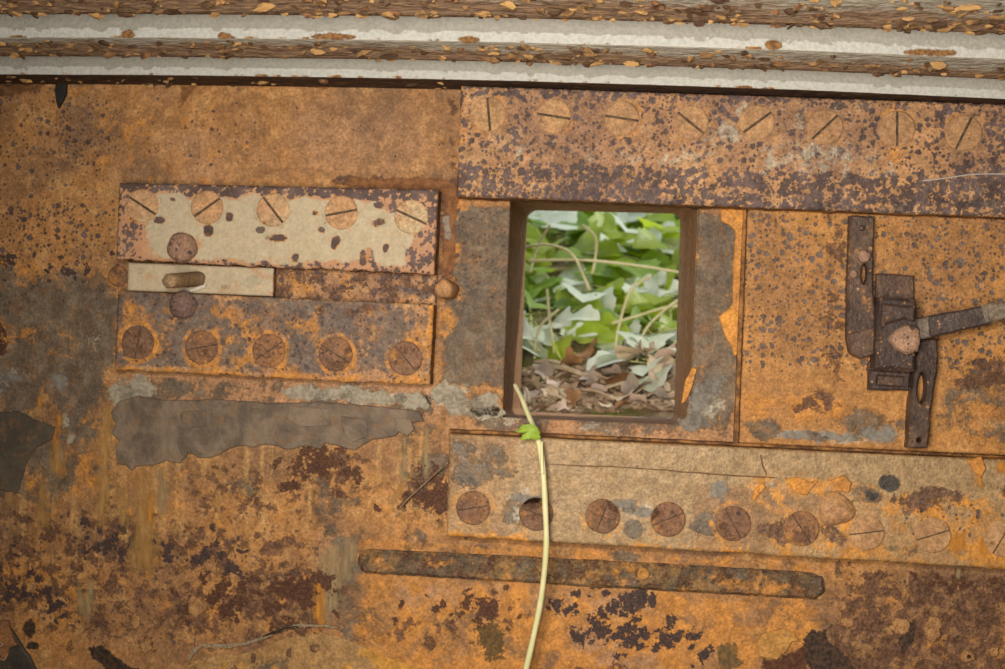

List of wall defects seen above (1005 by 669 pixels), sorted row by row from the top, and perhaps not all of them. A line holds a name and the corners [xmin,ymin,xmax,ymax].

peeling [0,411,56,493]
peeling [111,396,424,471]
rust [270,445,364,498]
rust [397,461,448,522]
rust [0,544,68,624]
rust [80,517,139,567]
rust [152,522,348,635]
peeling [0,618,39,669]
spalling [89,645,139,669]
rust [424,585,522,669]
rust [546,587,715,669]
rust [889,618,910,635]